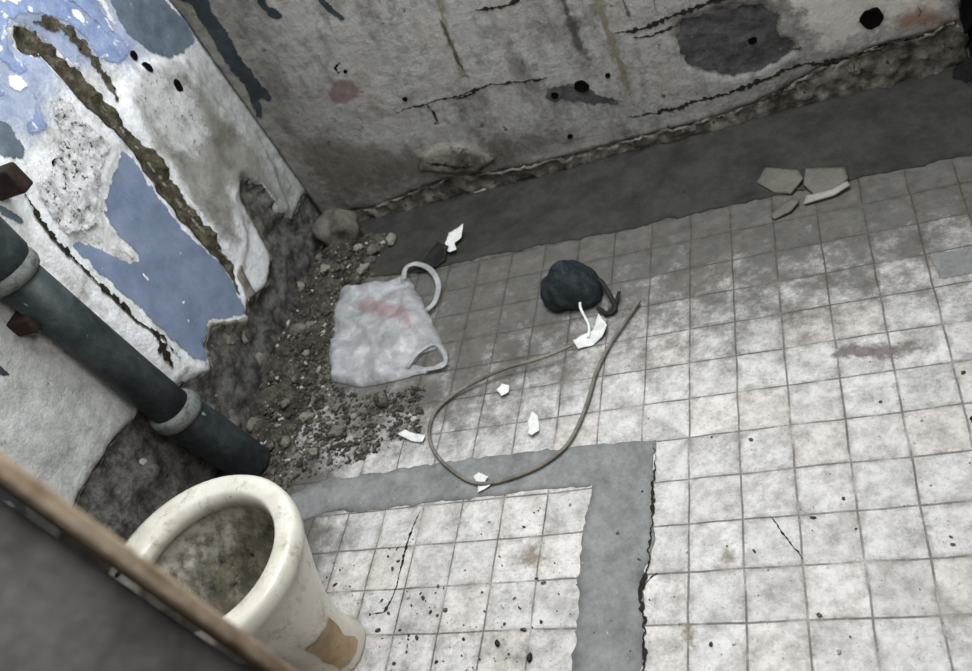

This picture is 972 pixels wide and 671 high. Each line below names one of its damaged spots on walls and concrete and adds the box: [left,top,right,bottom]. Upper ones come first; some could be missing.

peeling [0,121,25,159]
peeling [0,0,272,118]
peeling [139,71,210,157]
crack [395,76,554,122]
crack [475,0,520,11]
spalling [353,0,972,222]
crack [613,0,725,39]
peeling [0,206,23,224]
crack [25,193,181,368]
peeling [27,96,324,432]
spalling [73,412,228,543]
crack [638,448,658,671]